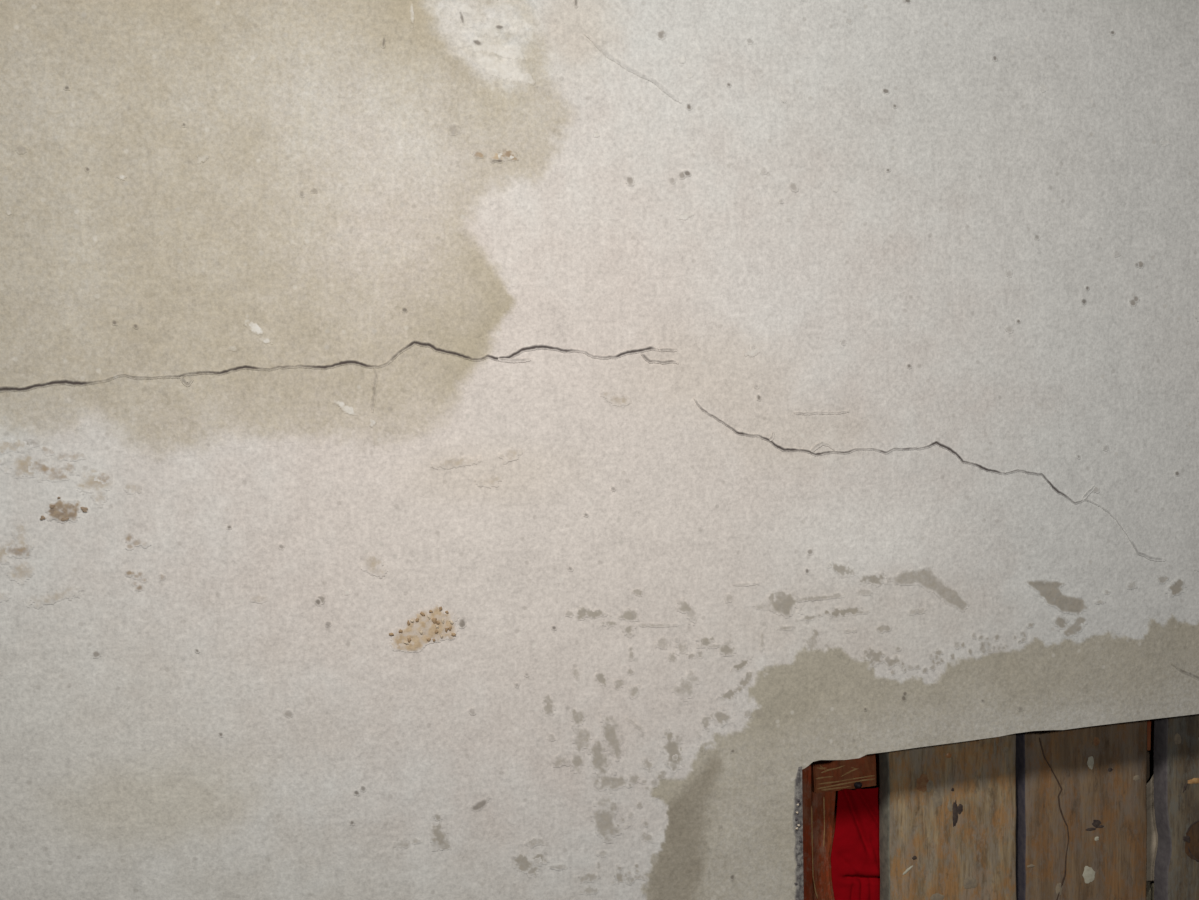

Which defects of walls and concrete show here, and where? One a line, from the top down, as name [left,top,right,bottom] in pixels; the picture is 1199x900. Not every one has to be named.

damp [0,0,581,508]
crack [0,340,678,413]
crack [694,397,1166,561]
peeling [511,561,1199,900]